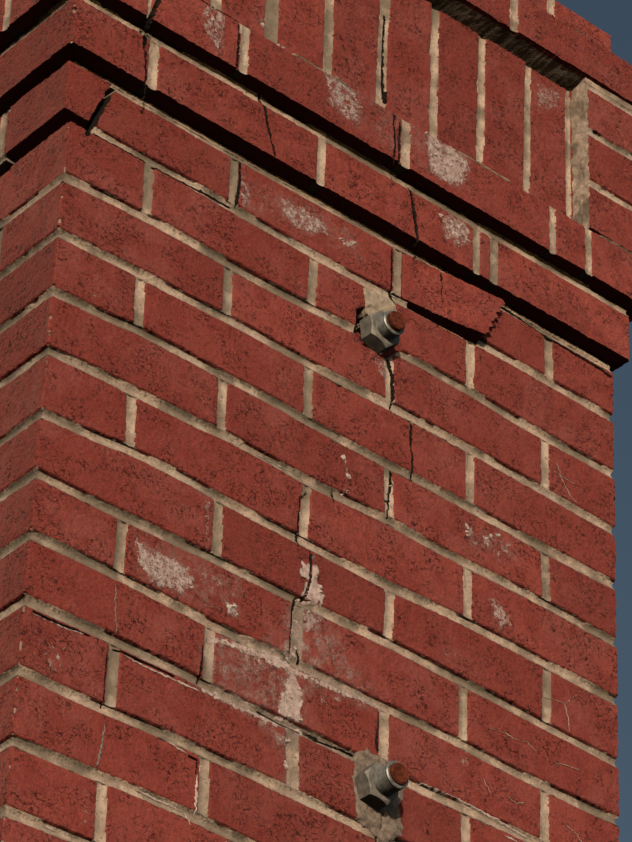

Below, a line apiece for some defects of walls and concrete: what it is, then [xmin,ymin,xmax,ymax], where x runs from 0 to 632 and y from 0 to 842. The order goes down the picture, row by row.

efflorescence [325,74,363,127]
crack [380,16,402,165]
efflorescence [425,132,470,185]
efflorescence [281,198,357,249]
crack [407,188,419,247]
efflorescence [439,213,470,247]
crack [387,251,395,303]
crack [385,357,395,412]
crack [384,423,414,519]
efflorescence [135,537,220,595]
crack [289,493,313,665]
efflorescence [124,556,380,745]